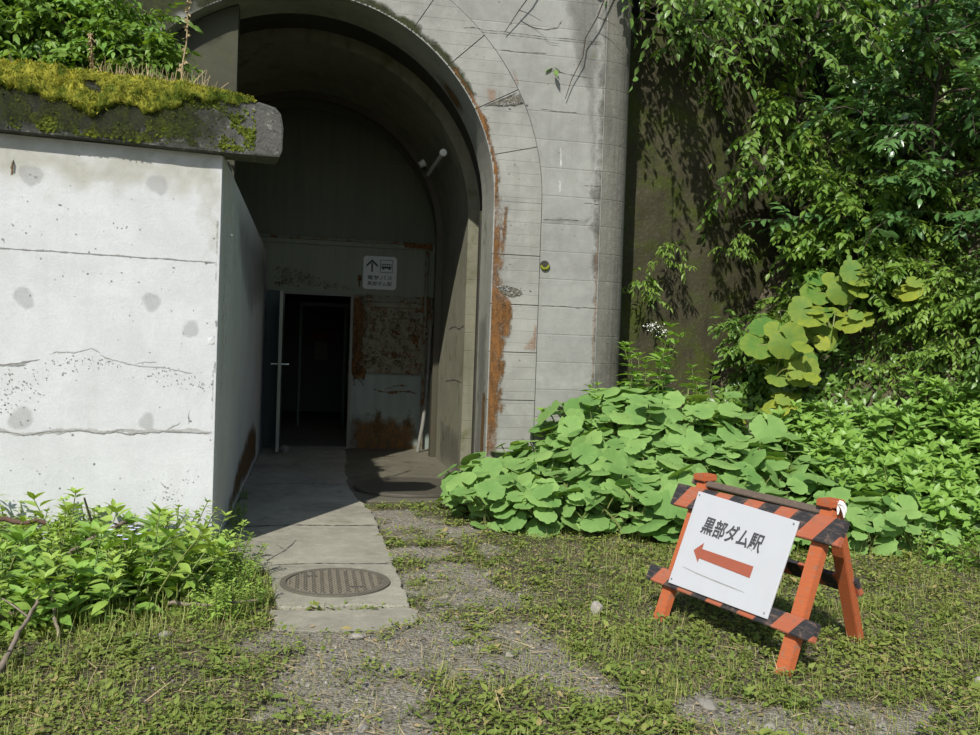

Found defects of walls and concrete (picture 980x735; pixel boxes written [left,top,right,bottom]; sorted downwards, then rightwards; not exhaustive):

spalling [489,94,528,108]
corrosion [445,68,511,457]
spalling [497,285,531,297]
crack [0,348,190,373]
crack [0,414,212,436]
corrosion [350,412,416,449]